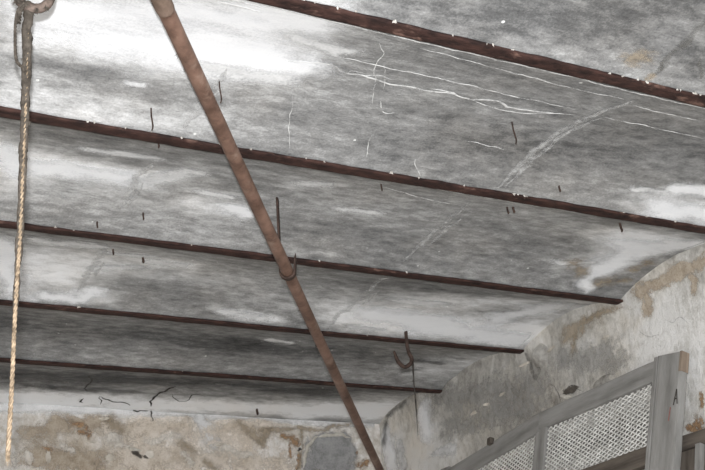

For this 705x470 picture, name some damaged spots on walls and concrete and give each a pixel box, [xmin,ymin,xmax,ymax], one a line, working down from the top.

crack [288,46,571,115]
crack [424,49,621,99]
crack [605,106,702,136]
leakage [79,148,165,161]
leakage [128,168,206,190]
leakage [195,190,235,199]
leakage [335,207,381,215]
leakage [26,237,158,272]
crack [79,376,203,422]
flaking render [17,415,356,470]